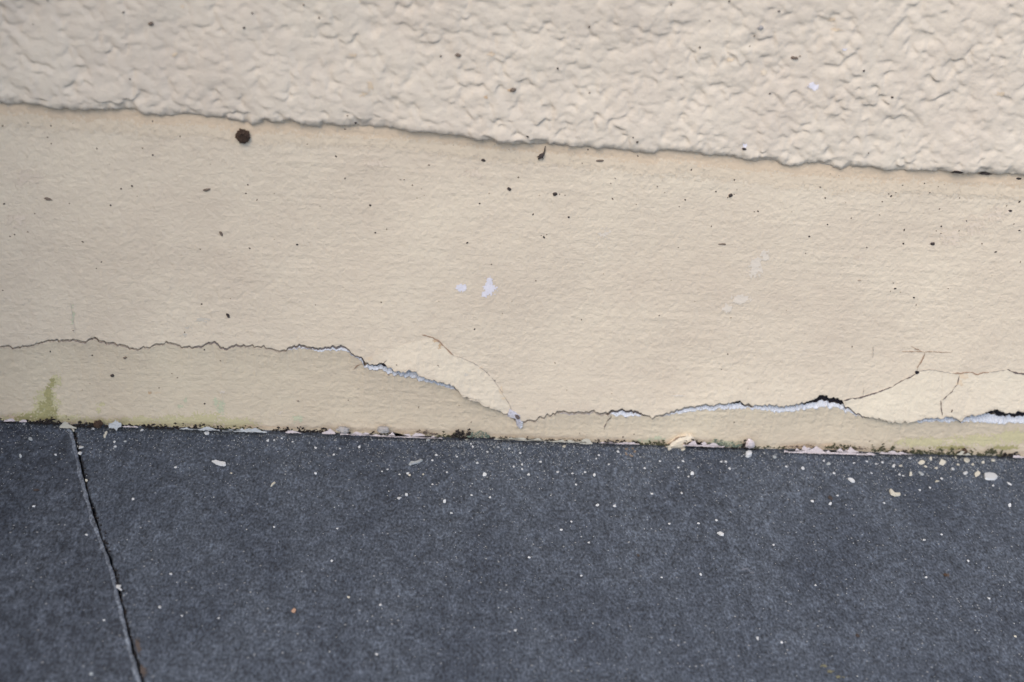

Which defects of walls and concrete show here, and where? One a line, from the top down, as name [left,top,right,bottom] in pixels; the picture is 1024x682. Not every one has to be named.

spalling [289,346,457,391]
crack [423,335,747,428]
crack [844,346,1024,421]
peeling [494,409,641,445]
spalling [662,400,862,418]
spalling [917,413,1024,425]